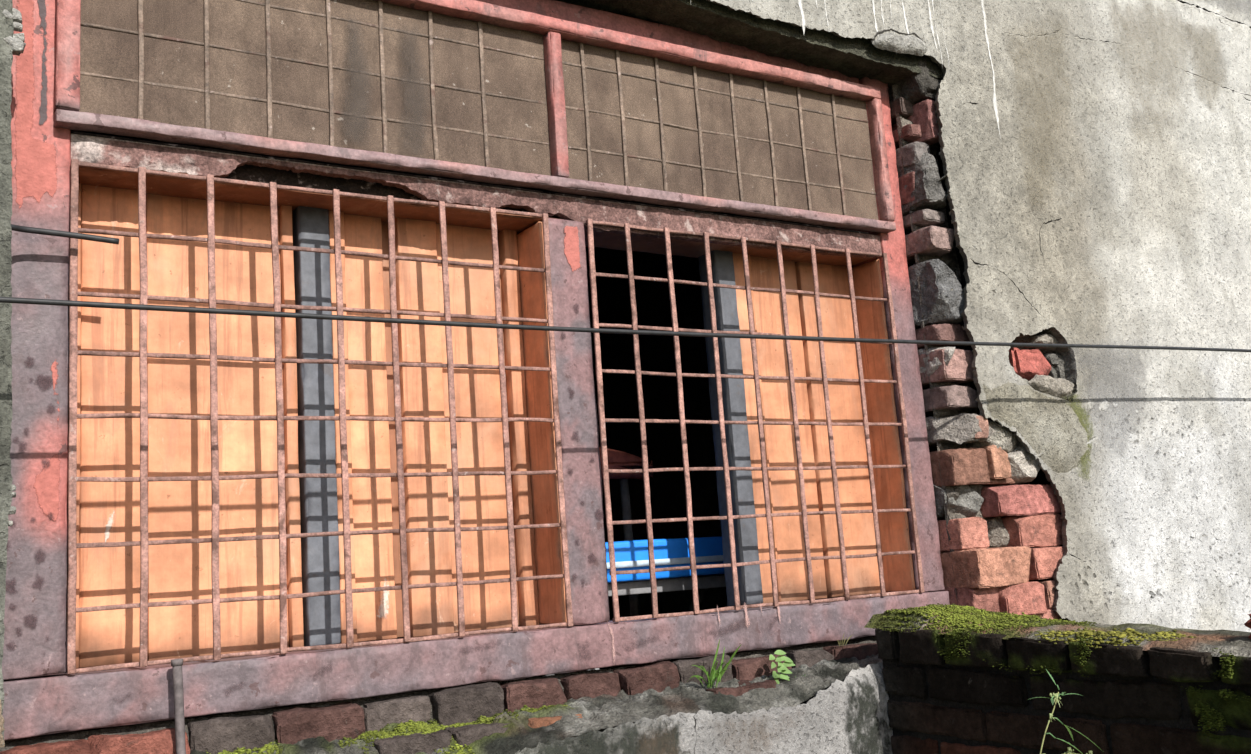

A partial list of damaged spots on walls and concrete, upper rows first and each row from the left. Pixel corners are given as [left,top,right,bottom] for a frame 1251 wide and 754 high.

water stain [872,0,909,34]
crack [1169,0,1251,31]
water stain [981,0,1001,138]
flaking render [871,28,1130,620]
water stain [527,724,680,754]